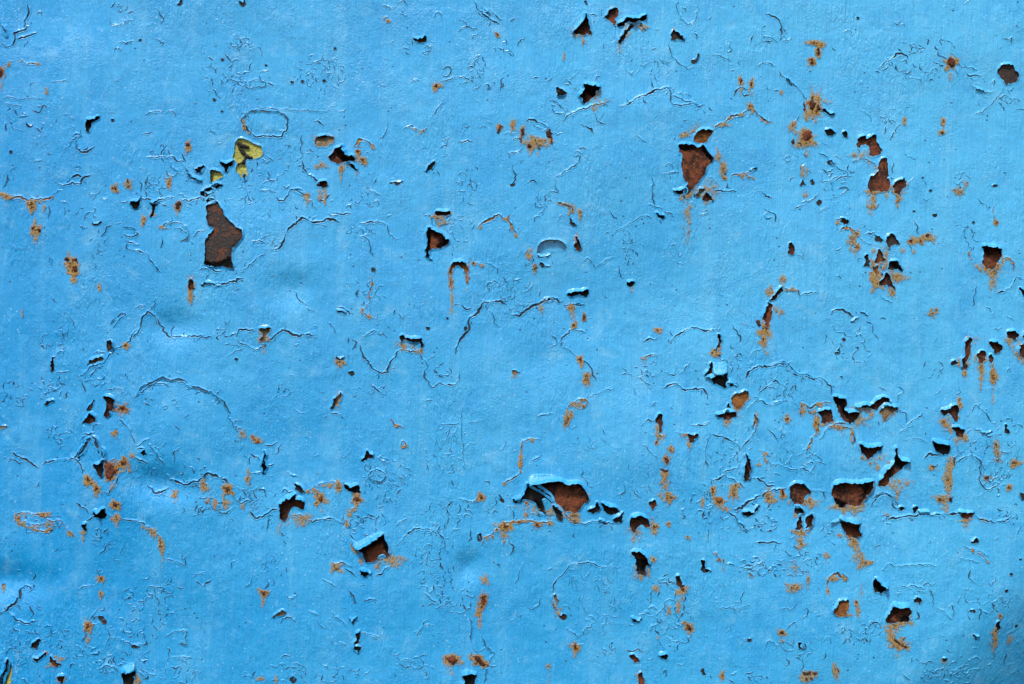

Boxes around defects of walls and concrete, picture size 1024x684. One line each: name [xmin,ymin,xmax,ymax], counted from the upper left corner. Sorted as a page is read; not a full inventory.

rust [64,252,80,284]
crack [0,2,399,295]
peeling [186,136,265,292]
rust [496,119,554,156]
crack [353,0,808,223]
peeling [672,127,719,204]
rust [846,229,936,297]
crack [0,165,882,684]
rust [82,453,135,528]
peeling [498,474,659,580]
peeling [787,441,930,540]
crack [867,361,1024,684]